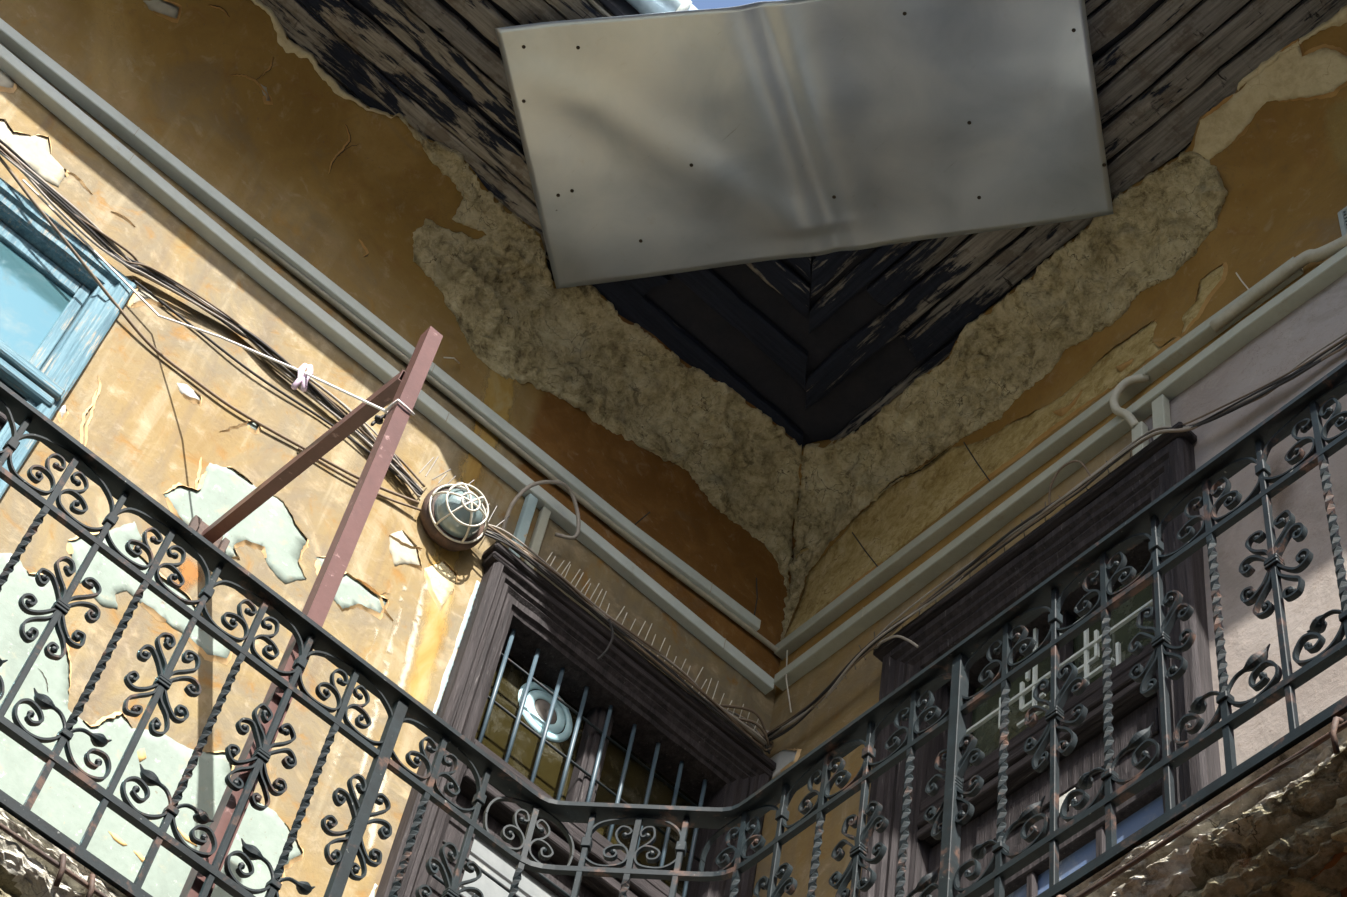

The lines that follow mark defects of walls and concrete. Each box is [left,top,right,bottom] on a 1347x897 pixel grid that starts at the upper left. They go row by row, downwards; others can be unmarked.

peeling [0,118,69,187]
flaking render [251,0,1347,640]
peeling [245,420,262,435]
peeling [163,463,326,584]
peeling [67,522,233,665]
peeling [433,581,480,714]
peeling [0,553,234,897]
peeling [210,802,304,897]
peeling [770,748,802,779]
spalling [1076,721,1347,897]